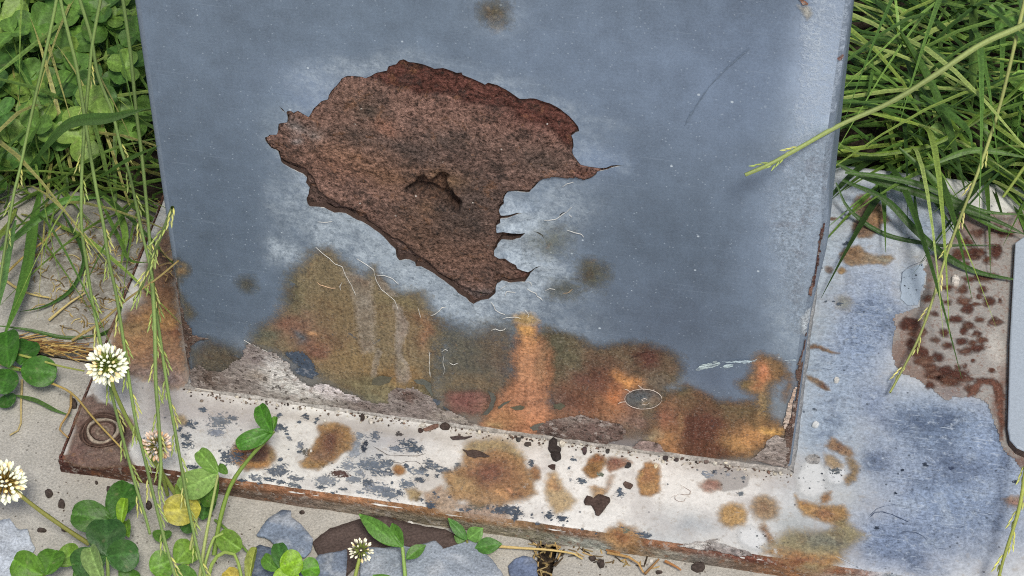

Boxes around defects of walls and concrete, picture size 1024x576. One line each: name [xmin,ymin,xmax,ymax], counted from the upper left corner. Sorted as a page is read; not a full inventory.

corrosion [58,376,181,488]
peeling [190,344,474,457]
corrosion [218,248,903,576]